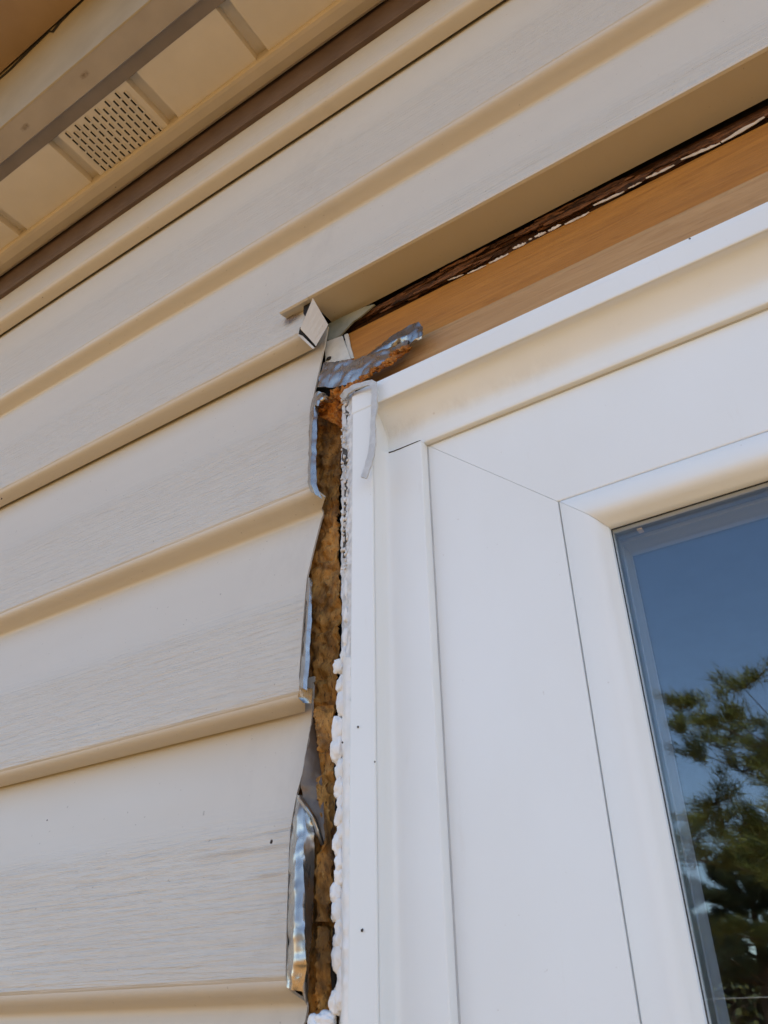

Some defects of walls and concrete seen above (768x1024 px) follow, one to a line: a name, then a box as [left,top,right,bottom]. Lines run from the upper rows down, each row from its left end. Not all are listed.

peeling [340,380,379,479]